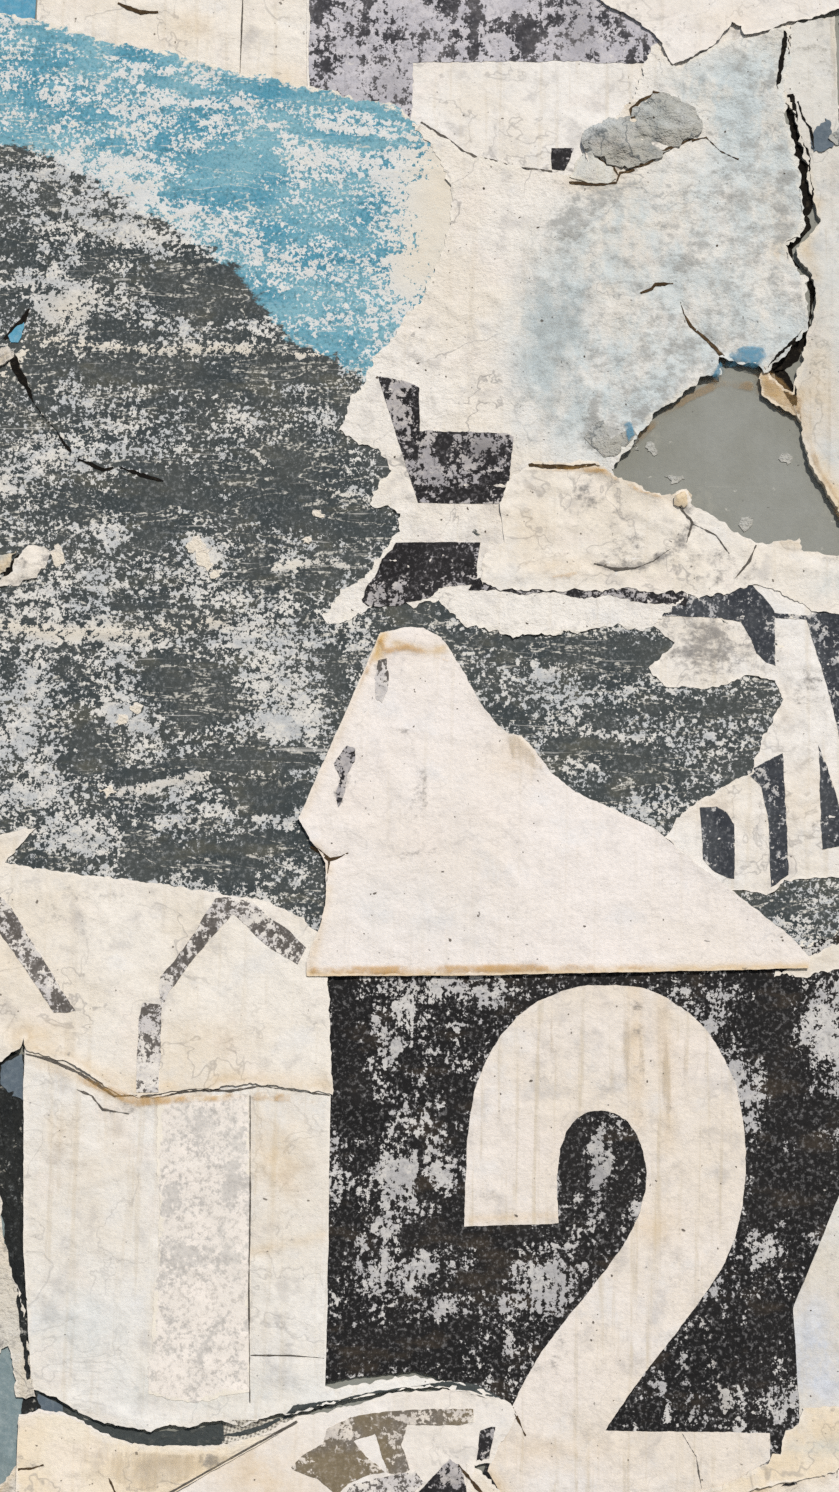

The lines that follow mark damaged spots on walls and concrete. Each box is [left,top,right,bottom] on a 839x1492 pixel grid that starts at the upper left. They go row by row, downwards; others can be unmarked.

peeling [811,118,839,152]
crack [768,30,815,406]
crack [4,308,164,482]
peeling [759,367,801,419]
peeling [634,441,658,456]